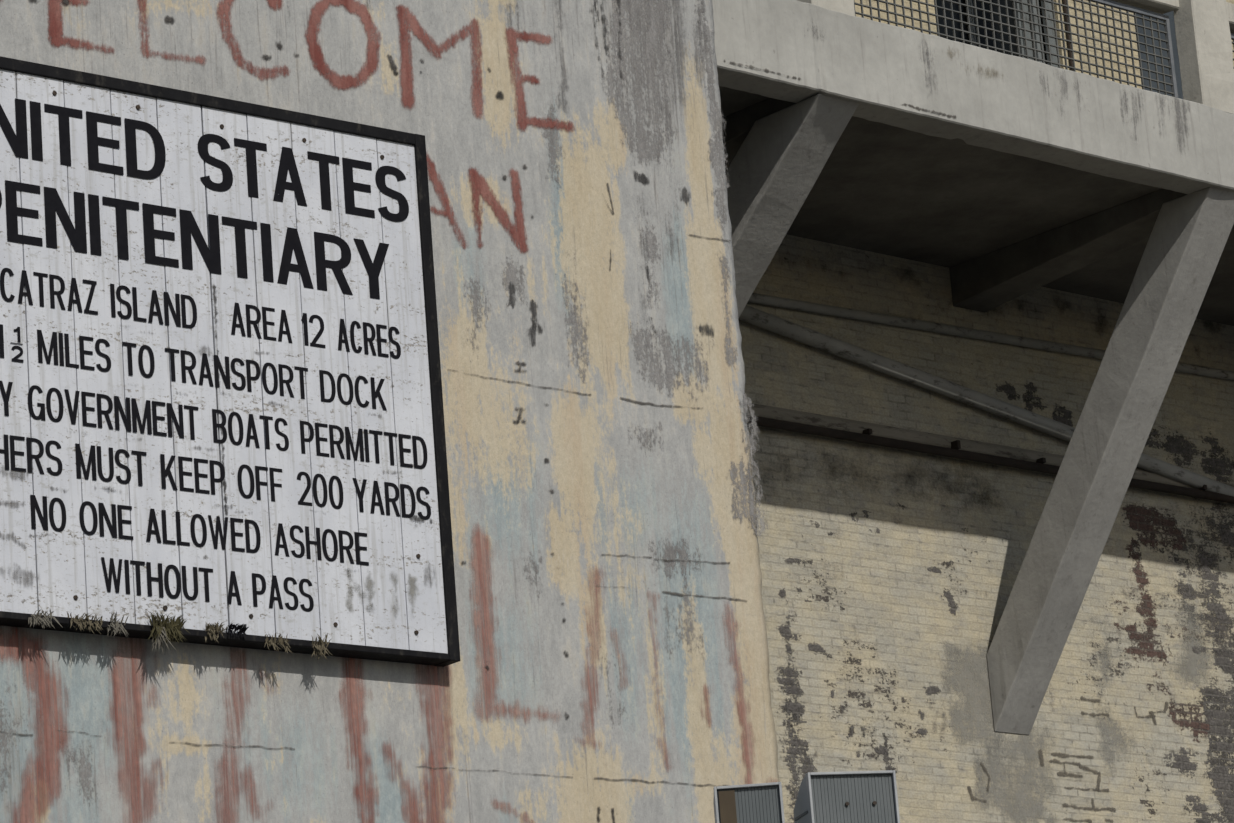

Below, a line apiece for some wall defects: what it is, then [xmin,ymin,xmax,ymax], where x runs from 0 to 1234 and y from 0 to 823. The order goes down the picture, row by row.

peeling [603,0,675,165]
peeling [695,1,729,241]
peeling [720,256,737,366]
peeling [730,394,767,536]
peeling [996,381,1073,426]
peeling [1145,420,1234,483]
peeling [777,558,941,823]
peeling [1076,497,1234,823]